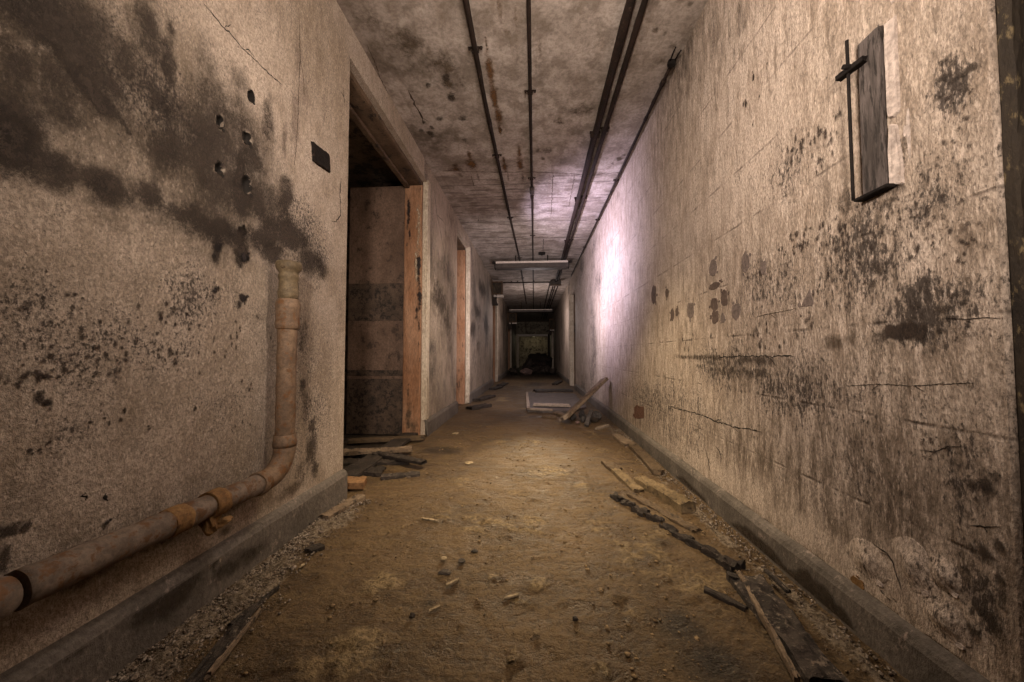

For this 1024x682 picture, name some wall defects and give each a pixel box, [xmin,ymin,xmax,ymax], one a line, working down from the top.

crack [204,4,304,164]
corrosion [485,37,503,133]
water stain [0,0,326,277]
water stain [787,110,841,174]
water stain [778,190,885,305]
water stain [879,187,987,263]
water stain [0,302,201,410]
crack [718,355,794,366]
crack [851,382,969,391]
water stain [875,292,966,343]
crack [669,406,760,470]
water stain [732,524,853,629]